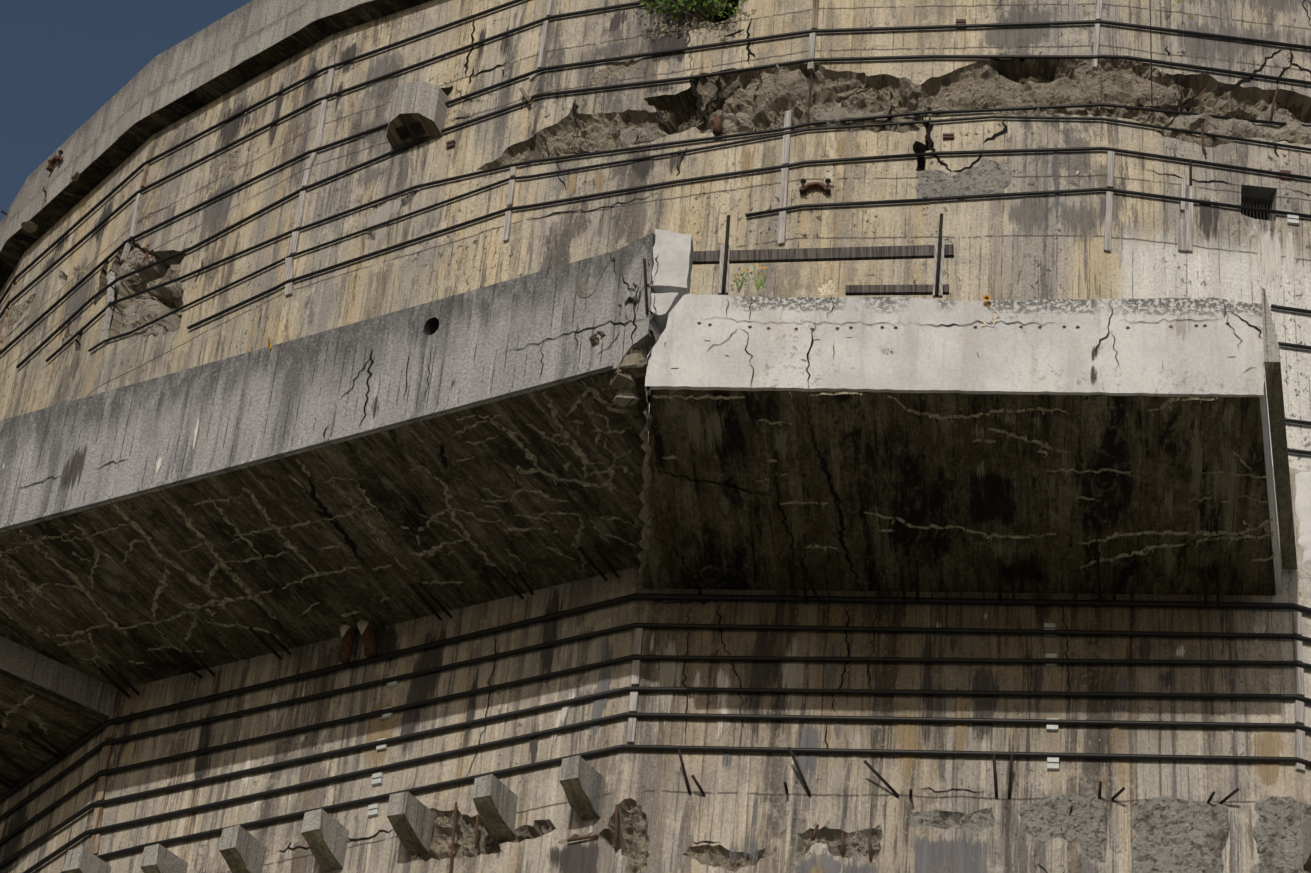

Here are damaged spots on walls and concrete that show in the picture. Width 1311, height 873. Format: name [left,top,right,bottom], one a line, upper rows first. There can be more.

damp [980,10,1050,49]
damp [1177,0,1311,63]
crack [450,14,506,120]
crack [1165,47,1311,107]
crack [528,100,687,219]
spalling [477,58,1311,173]
crack [925,116,1008,172]
damp [970,460,1049,583]
spalling [413,798,650,873]
damp [547,841,599,873]
spalling [682,844,766,872]
spalling [796,822,883,862]